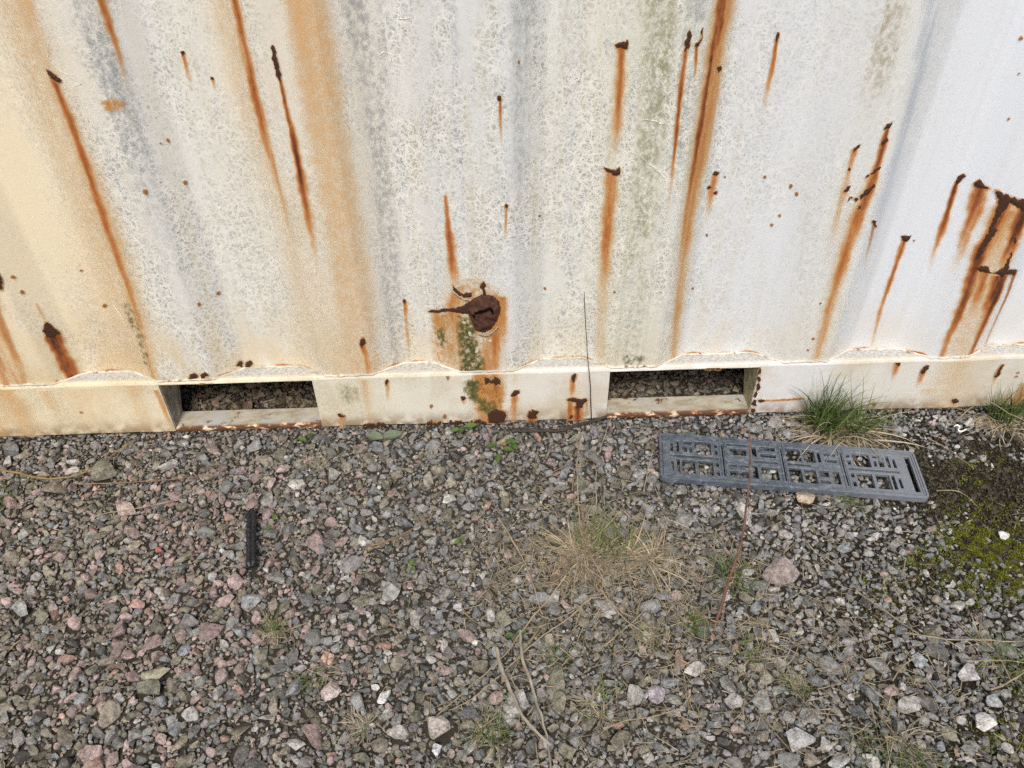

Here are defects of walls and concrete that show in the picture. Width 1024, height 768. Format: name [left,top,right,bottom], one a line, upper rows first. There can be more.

rust [36,304,79,382]
rust [46,69,146,341]
rust [219,0,281,194]
rust [271,0,373,374]
rust [444,195,458,280]
rust [426,374,539,425]
rust [601,167,621,285]
rust [614,39,629,136]
rust [671,0,735,358]
rust [807,123,892,351]
rust [875,235,915,332]
rust [909,173,1024,382]